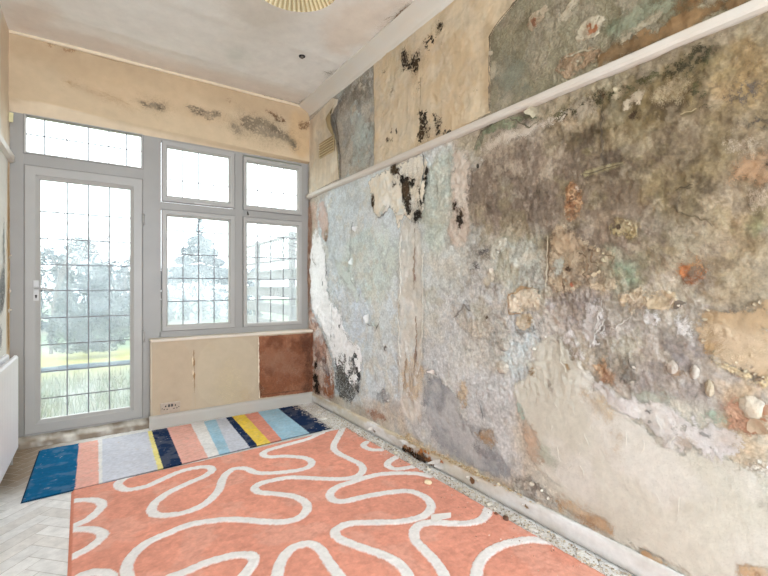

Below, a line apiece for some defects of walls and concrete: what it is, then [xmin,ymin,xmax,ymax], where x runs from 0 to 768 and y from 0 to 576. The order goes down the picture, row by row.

water stain [185,98,310,158]
flaking render [330,66,374,180]
water stain [369,17,451,156]
flaking render [446,0,751,249]
water stain [550,34,722,123]
water stain [723,41,768,138]
rust [556,174,592,231]
flaking render [257,200,362,401]
rust [666,242,726,298]
crack [189,350,197,392]
water stain [334,353,362,403]
flaking render [397,222,768,576]